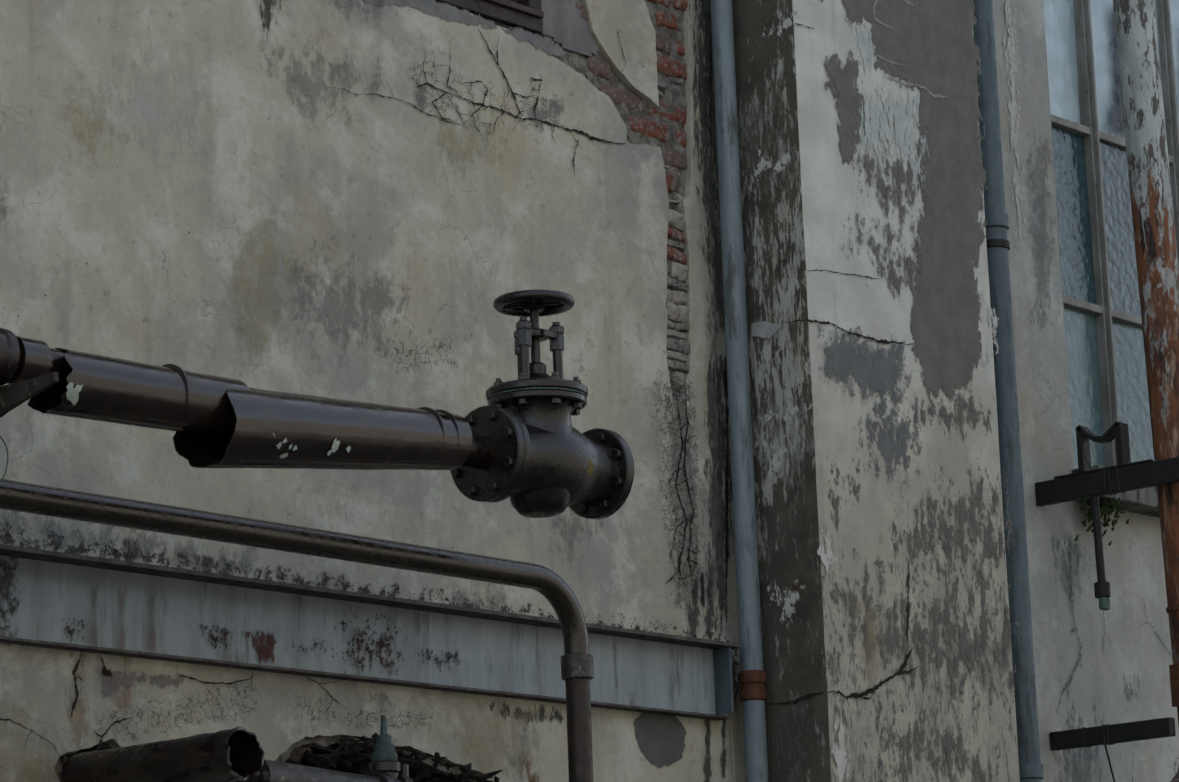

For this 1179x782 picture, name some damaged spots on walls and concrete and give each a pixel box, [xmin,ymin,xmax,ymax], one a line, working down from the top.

crack [873,0,927,30]
crack [329,29,626,173]
spalling [586,0,706,610]
crack [805,269,878,279]
crack [785,319,912,346]
peeling [813,0,1040,782]
corrosion [201,608,464,687]
crack [768,561,923,706]
crack [0,718,59,769]
crack [70,651,258,751]
leakage [634,712,687,768]
leakage [703,719,727,782]